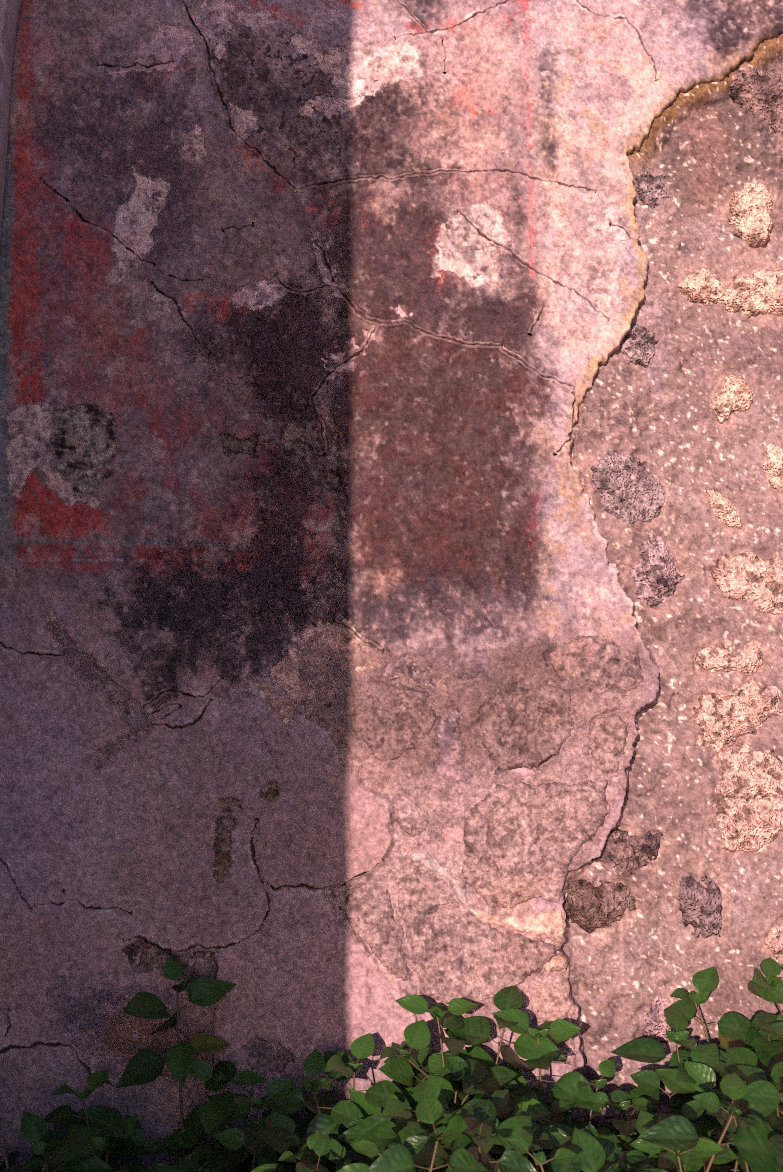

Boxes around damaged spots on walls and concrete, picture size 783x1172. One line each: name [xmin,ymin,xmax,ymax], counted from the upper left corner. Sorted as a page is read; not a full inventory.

water stain [36,72,200,233]
peeling [290,34,424,118]
crack [177,0,597,195]
crack [573,0,660,81]
peeling [110,166,172,285]
water stain [105,31,555,707]
crack [272,208,612,456]
spalling [6,401,117,508]
water stain [402,663,469,764]
crack [0,820,384,956]
spalling [213,797,242,884]
spalling [254,619,656,1100]